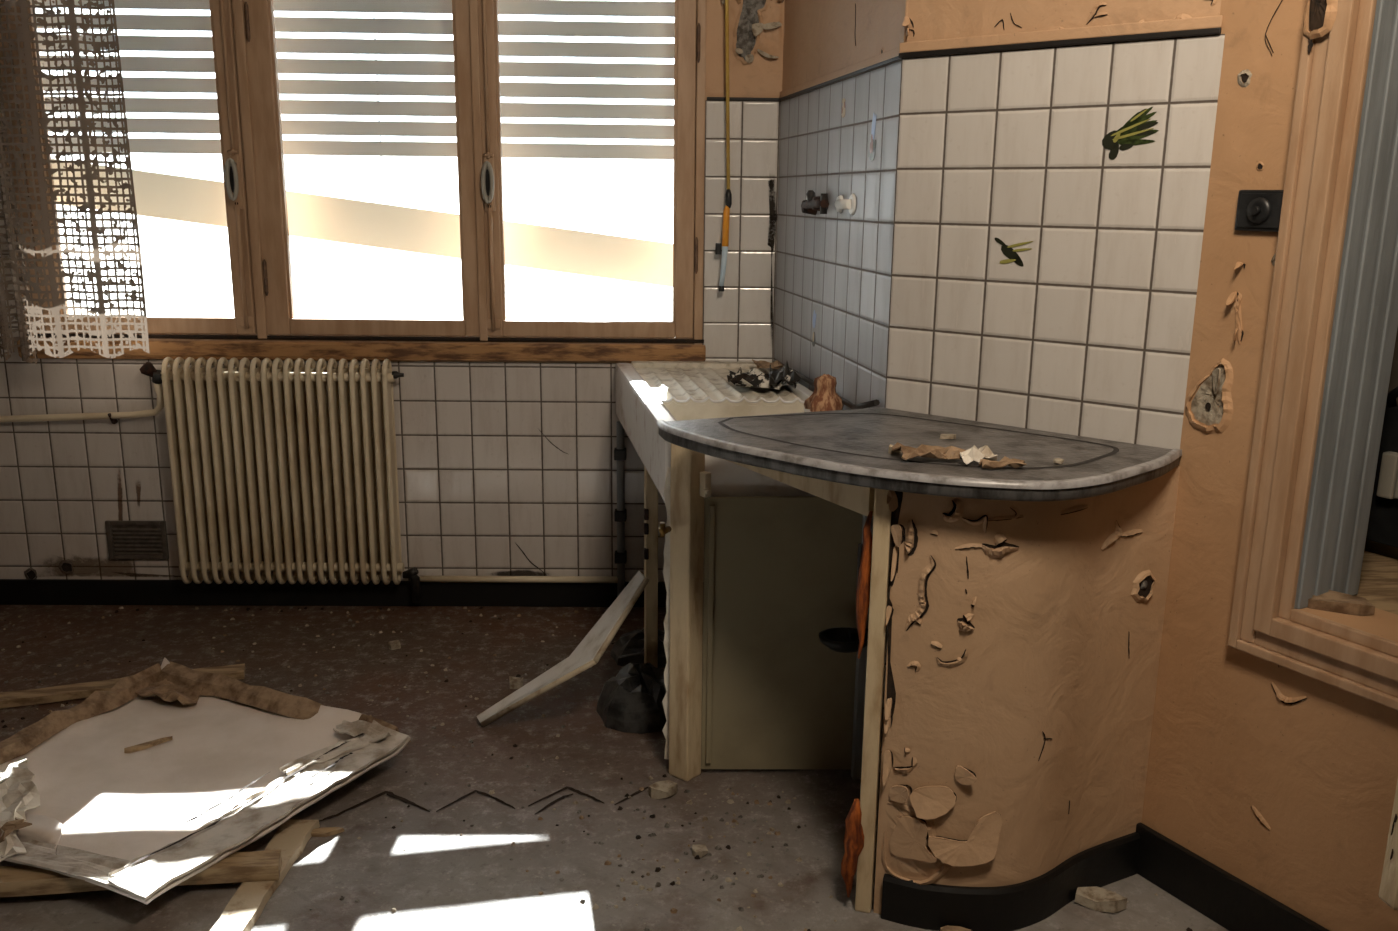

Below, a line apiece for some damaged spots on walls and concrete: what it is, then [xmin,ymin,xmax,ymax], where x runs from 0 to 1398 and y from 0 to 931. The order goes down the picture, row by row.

spalling [721,0,784,65]
spalling [1185,358,1233,435]
peeling [881,490,1002,885]